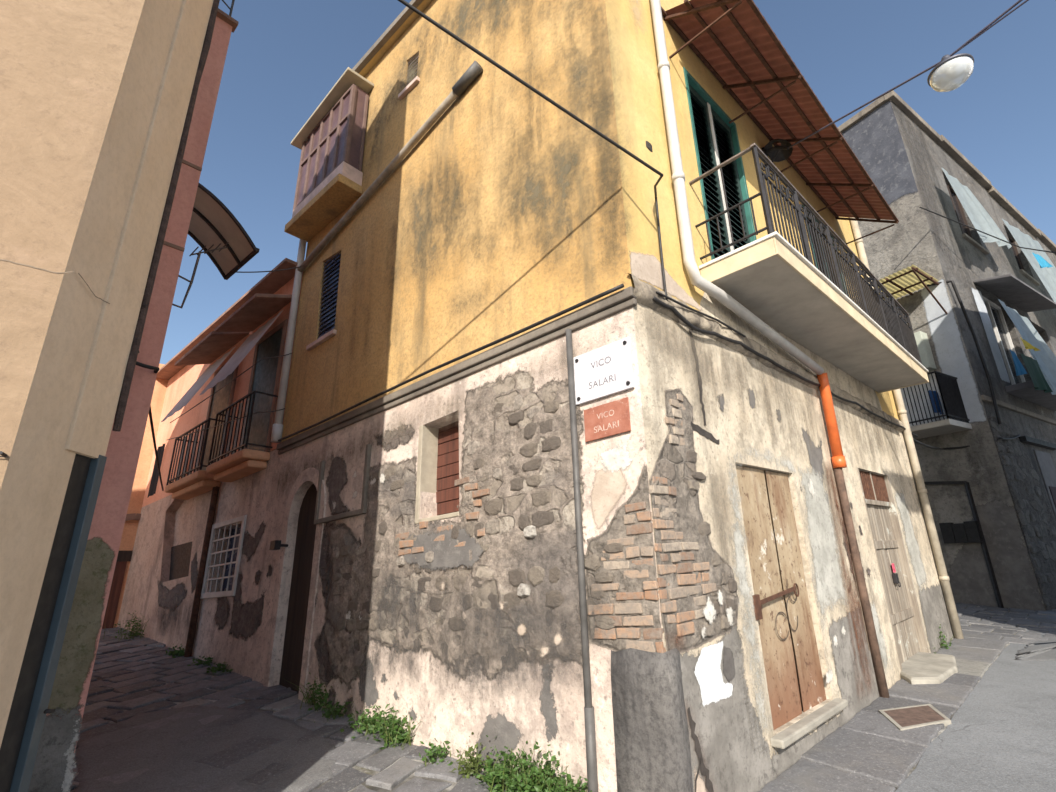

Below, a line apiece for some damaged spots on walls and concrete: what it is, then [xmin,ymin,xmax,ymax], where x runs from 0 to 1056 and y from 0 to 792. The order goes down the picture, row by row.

leakage [441,0,516,42]
leakage [390,61,420,92]
leakage [412,183,462,270]
leakage [511,146,579,246]
peeling [157,551,198,612]
peeling [214,520,272,641]
flaking render [313,369,739,742]
peeling [48,537,115,792]